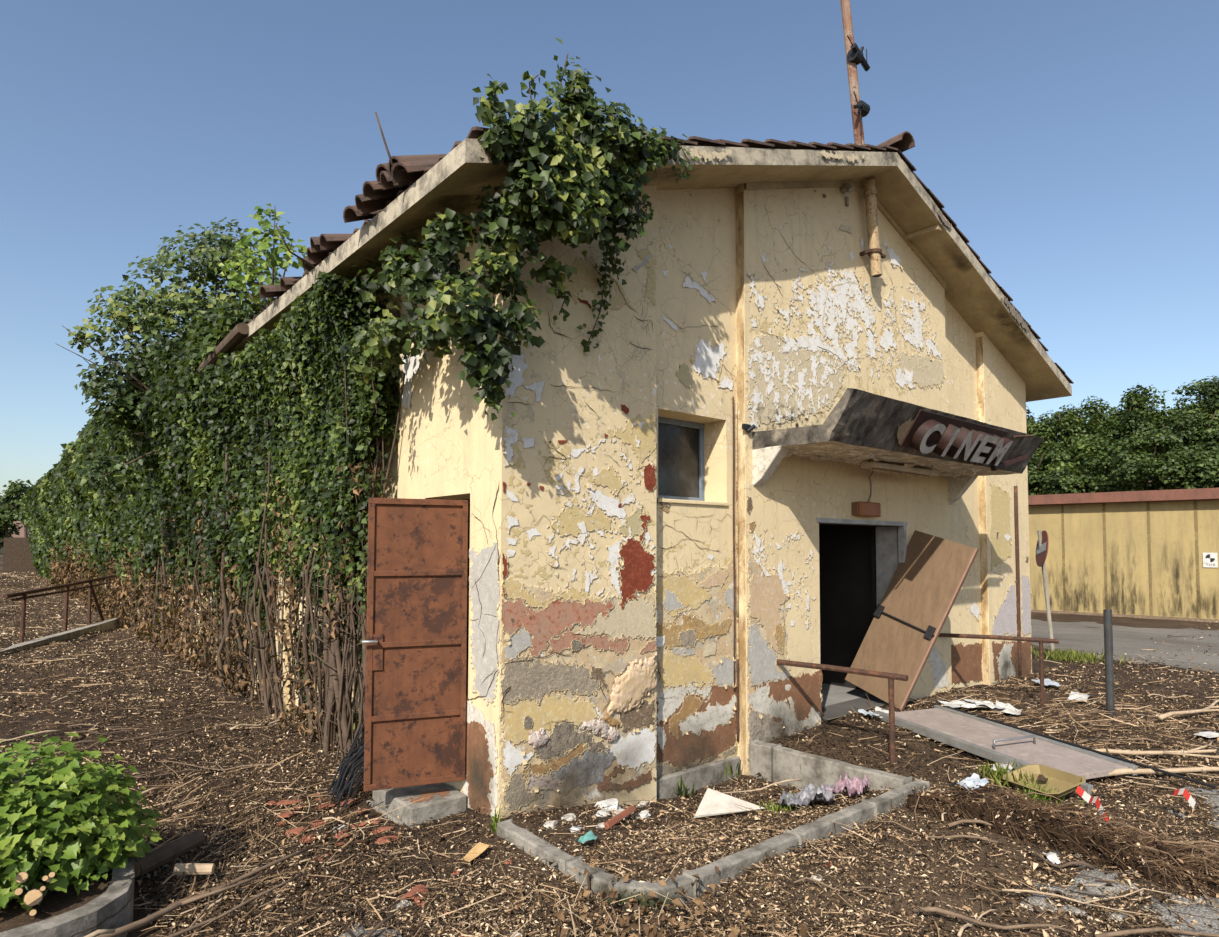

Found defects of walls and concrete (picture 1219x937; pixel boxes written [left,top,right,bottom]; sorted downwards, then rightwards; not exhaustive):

crack [590,262,786,350]
peeling [676,224,945,435]
spalling [868,418,914,466]
flaking render [457,248,823,817]
peeling [928,556,1032,692]